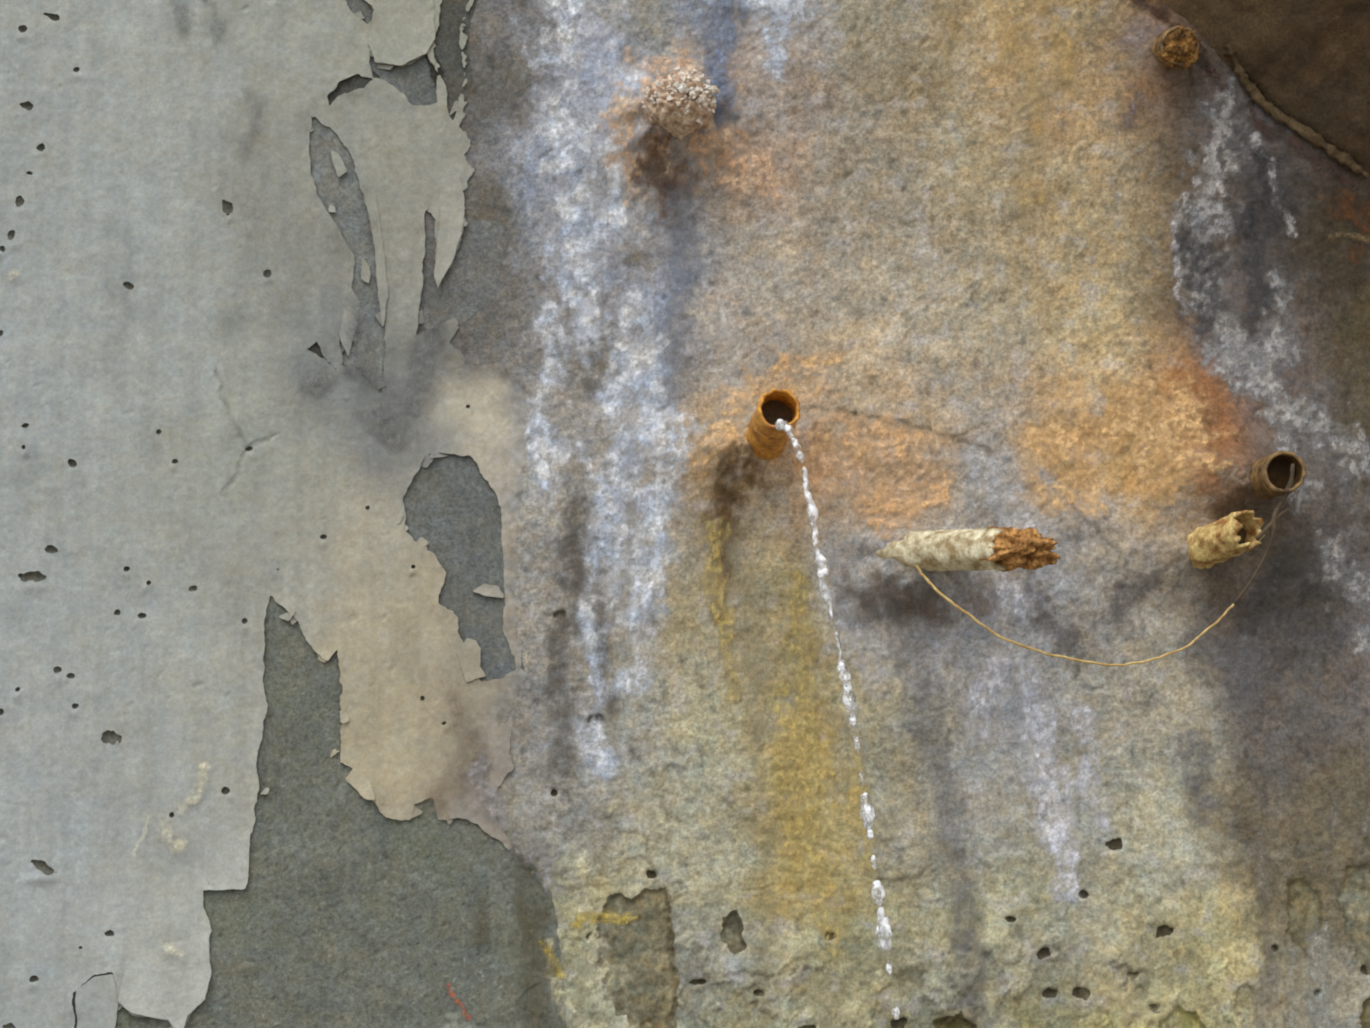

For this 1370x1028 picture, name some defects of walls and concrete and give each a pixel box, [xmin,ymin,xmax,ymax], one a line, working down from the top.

peeling [327,0,477,120]
corrosion [600,50,781,230]
peeling [307,117,388,393]
peeling [416,175,505,335]
water stain [1171,49,1370,481]
peeling [395,449,524,682]
water stain [524,0,697,781]
corrosion [807,413,951,538]
water stain [1185,526,1370,712]
water stain [1289,480,1324,506]
peeling [72,596,568,1028]